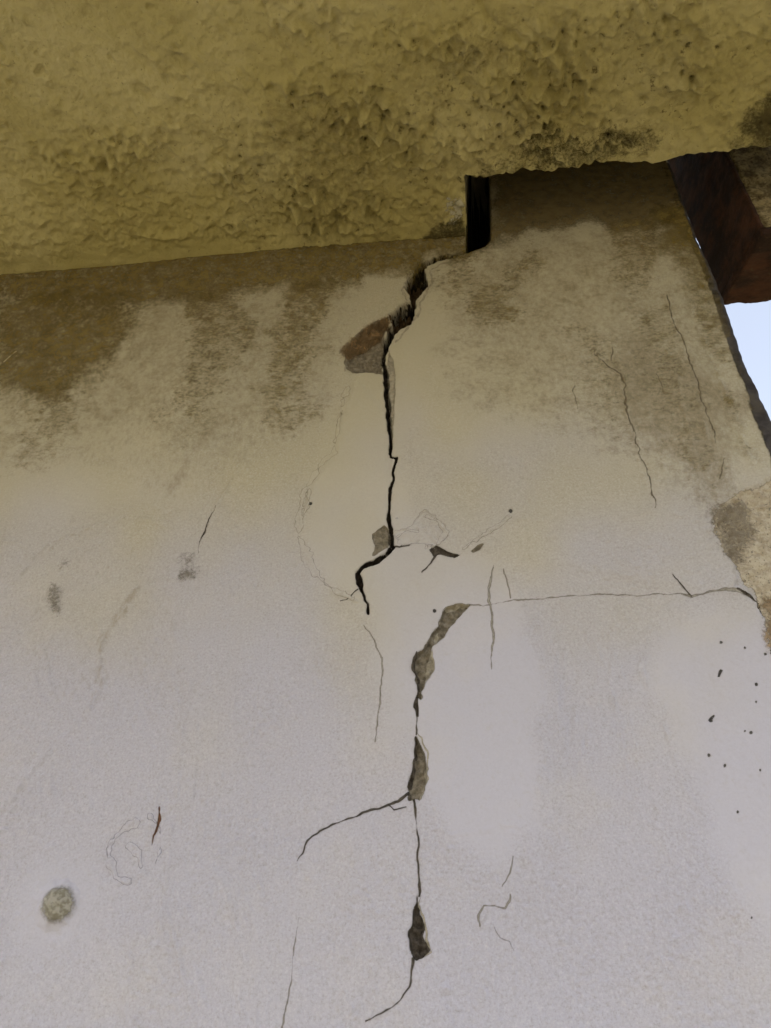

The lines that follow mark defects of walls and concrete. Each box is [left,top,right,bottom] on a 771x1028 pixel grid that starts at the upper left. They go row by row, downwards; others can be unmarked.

damp [742,94,771,148]
damp [0,218,472,429]
flaking render [340,316,391,375]
spalling [667,163,771,456]
crack [297,175,761,1022]
spalling [712,480,771,655]